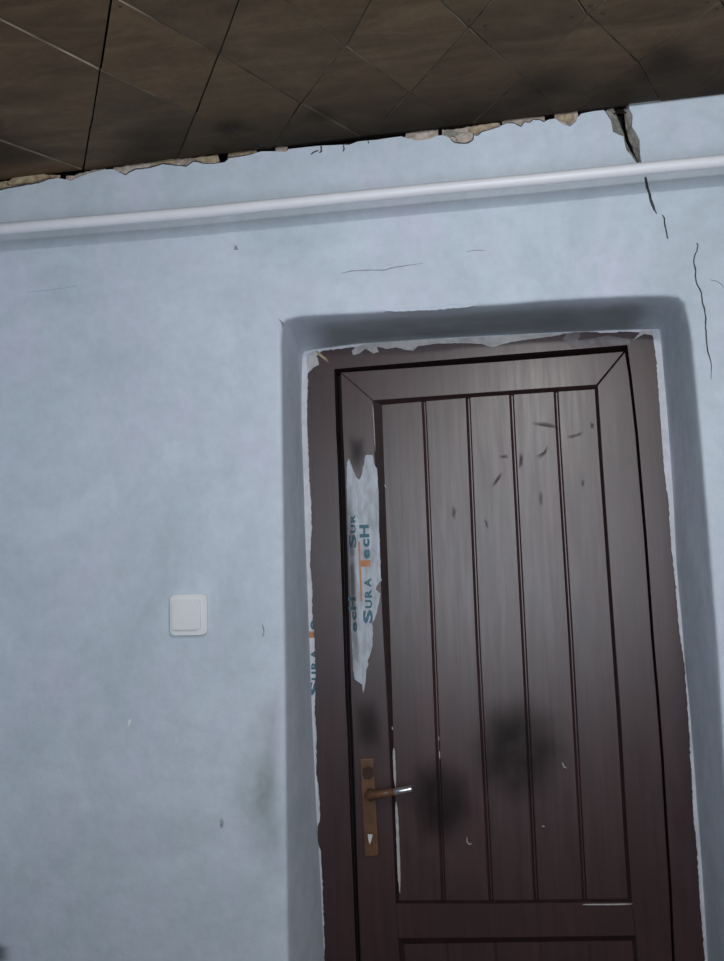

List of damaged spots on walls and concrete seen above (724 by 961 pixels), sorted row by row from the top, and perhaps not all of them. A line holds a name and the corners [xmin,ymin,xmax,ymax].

spalling [0,151,257,190]
crack [605,108,668,239]
crack [341,263,423,274]
crack [693,243,724,374]